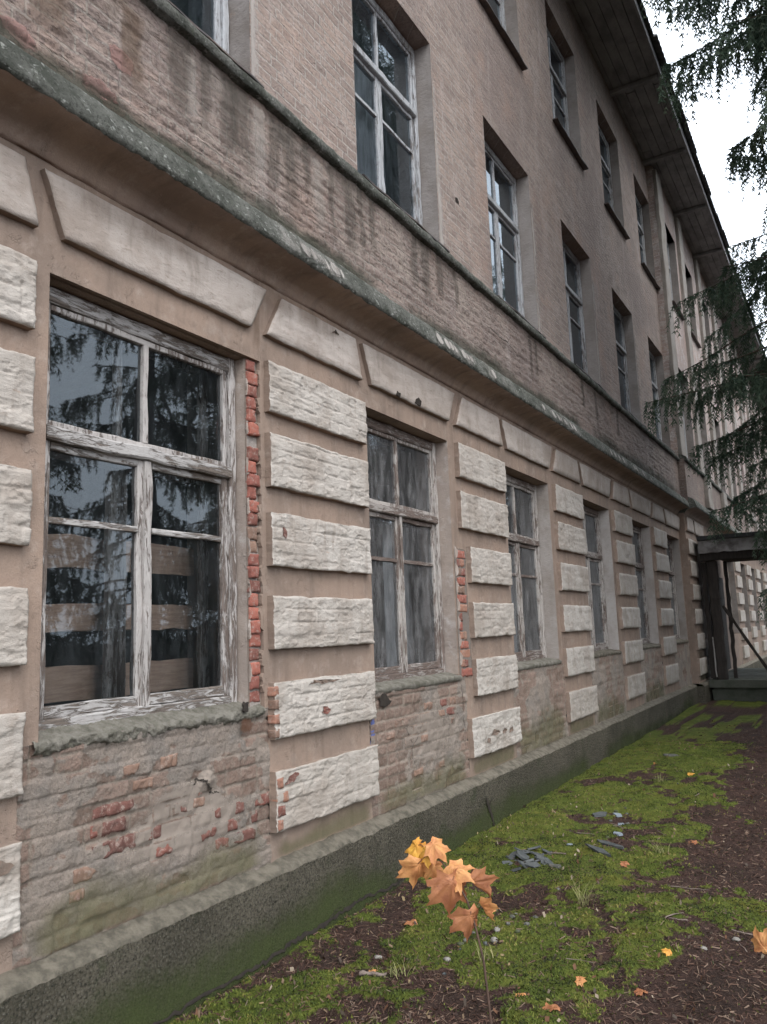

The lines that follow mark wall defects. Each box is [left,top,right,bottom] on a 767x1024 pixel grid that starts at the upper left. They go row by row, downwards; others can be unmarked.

water stain [435,133,444,245]
water stain [302,244,344,277]
spalling [245,358,280,738]
spalling [90,753,299,871]